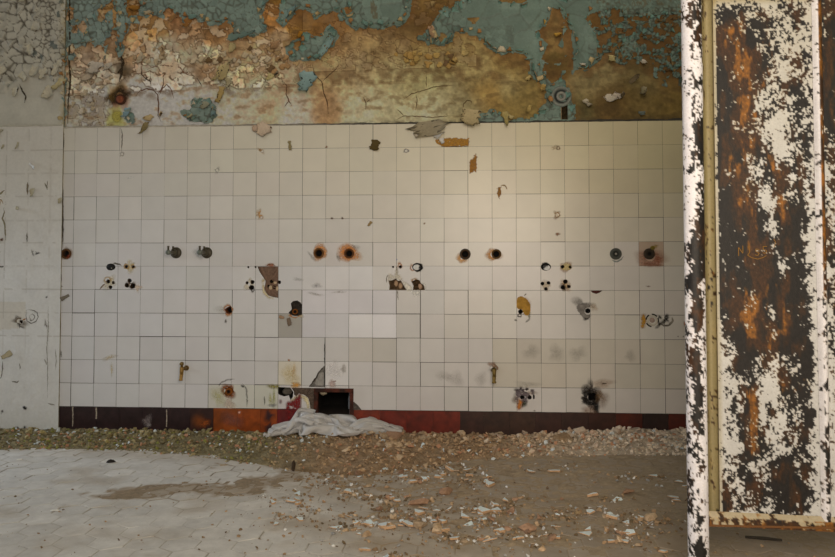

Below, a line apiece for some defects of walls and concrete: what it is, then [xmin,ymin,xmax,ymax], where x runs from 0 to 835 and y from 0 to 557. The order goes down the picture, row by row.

peeling [57,0,682,138]
spalling [251,264,279,298]
spalling [278,344,325,409]